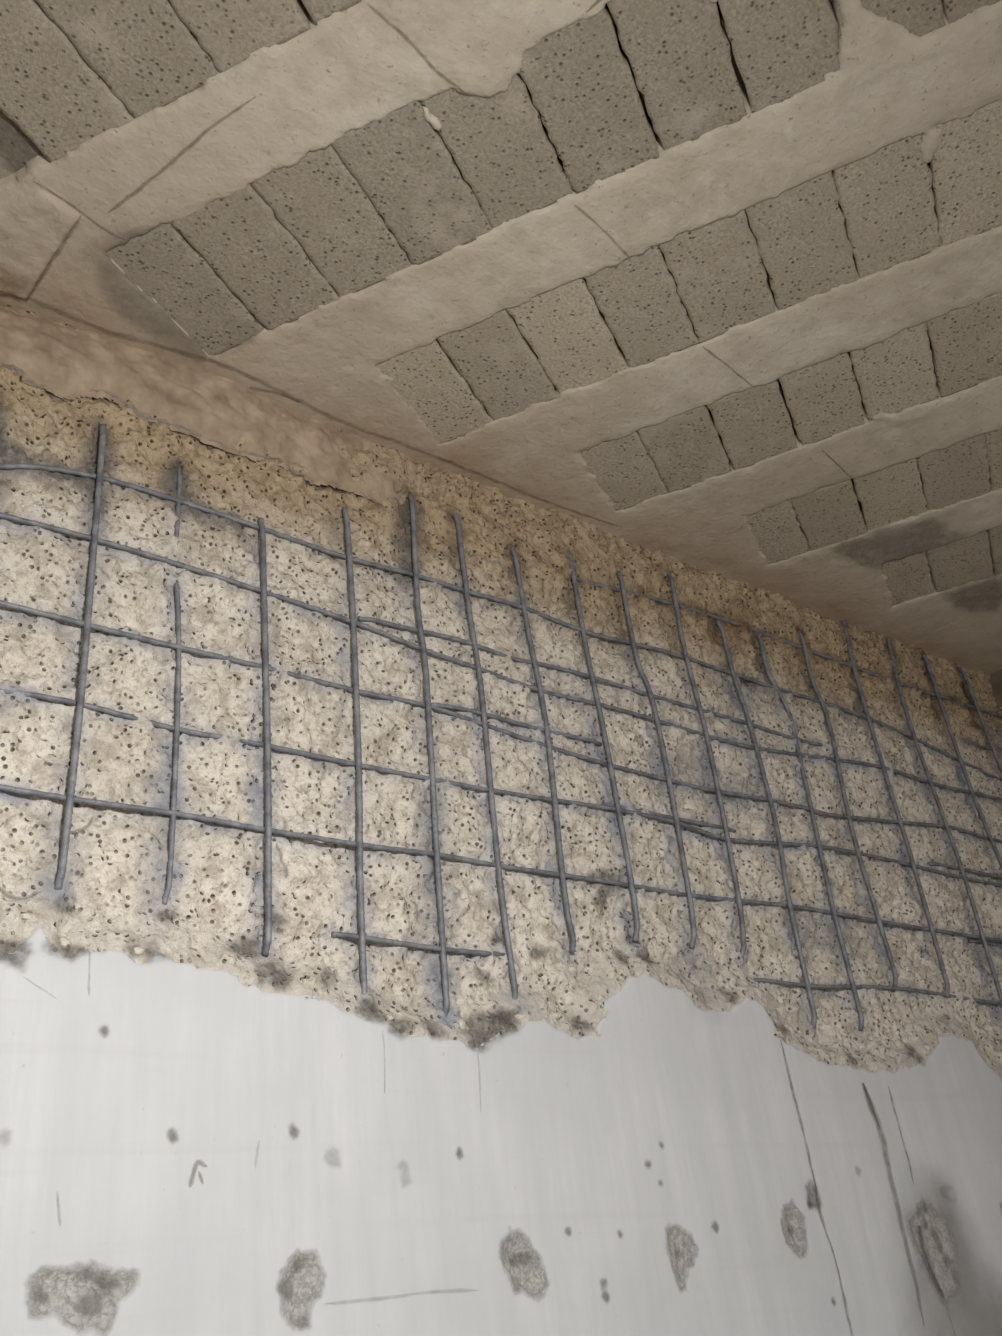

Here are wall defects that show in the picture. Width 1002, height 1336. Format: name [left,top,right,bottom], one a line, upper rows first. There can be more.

spalling [0,363,1002,1080]
spalling [28,1264,136,1332]
spalling [279,1253,323,1326]
spalling [501,1232,547,1296]
spalling [667,1226,698,1289]
spalling [782,1203,811,1256]
crack [780,1040,850,1324]
crack [862,1083,956,1336]